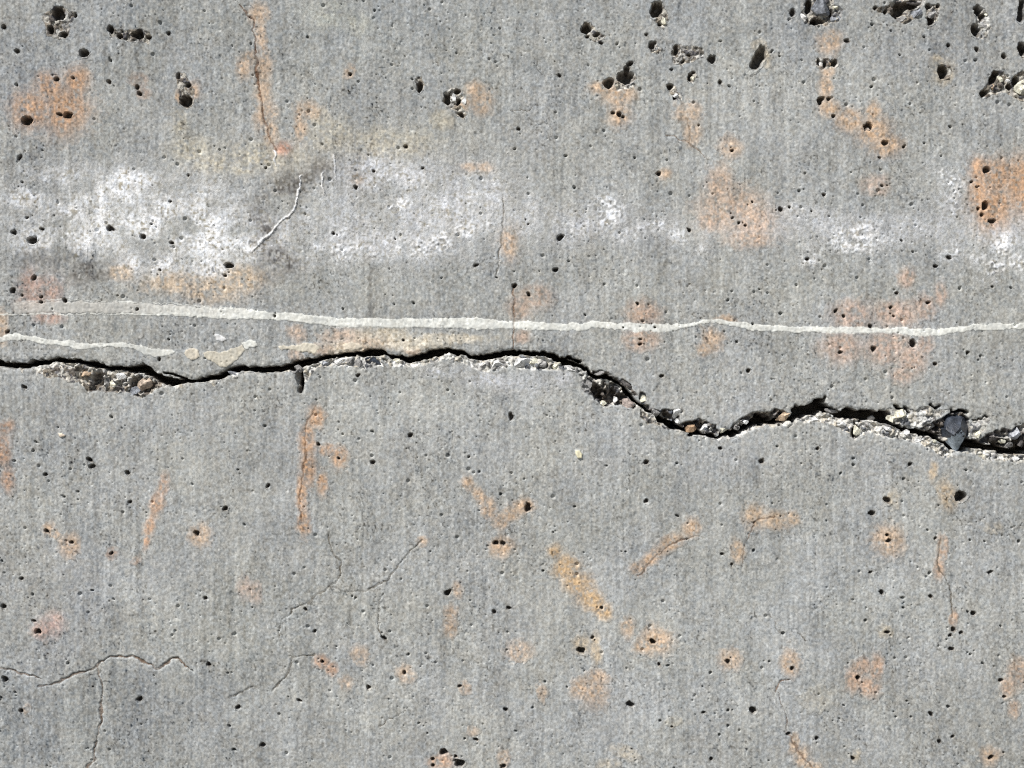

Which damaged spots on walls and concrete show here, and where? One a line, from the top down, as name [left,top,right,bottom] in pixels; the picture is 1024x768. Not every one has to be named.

rust [0,58,112,151]
rust [233,0,326,158]
water stain [0,101,1024,400]
rust [667,95,790,253]
rust [812,24,912,199]
rust [961,137,1024,244]
crack [0,198,1024,465]
crack [299,450,307,523]
rust [292,400,351,543]
rust [457,472,540,563]
rust [541,540,681,717]
rust [839,622,896,705]